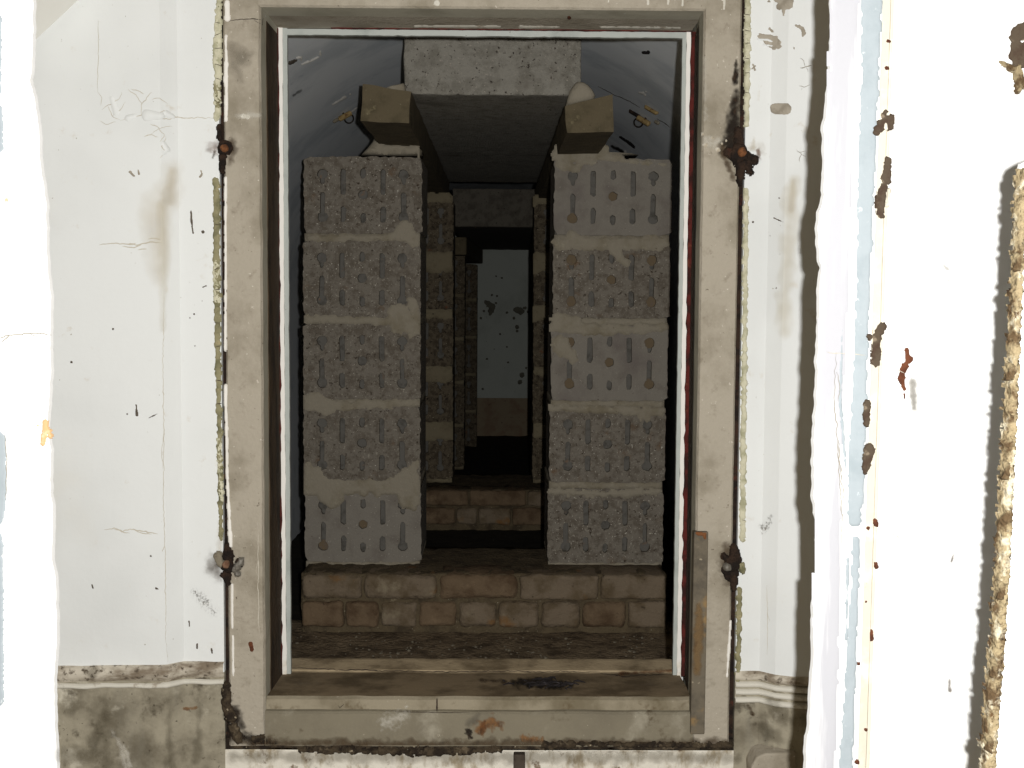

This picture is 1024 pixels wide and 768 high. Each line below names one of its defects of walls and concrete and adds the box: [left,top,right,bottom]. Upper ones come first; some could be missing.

crack [97,34,214,158]
spalling [999,22,1024,94]
peeling [811,0,883,768]
corrosion [897,348,916,409]
spalling [975,168,1024,768]
corrosion [466,718,502,739]